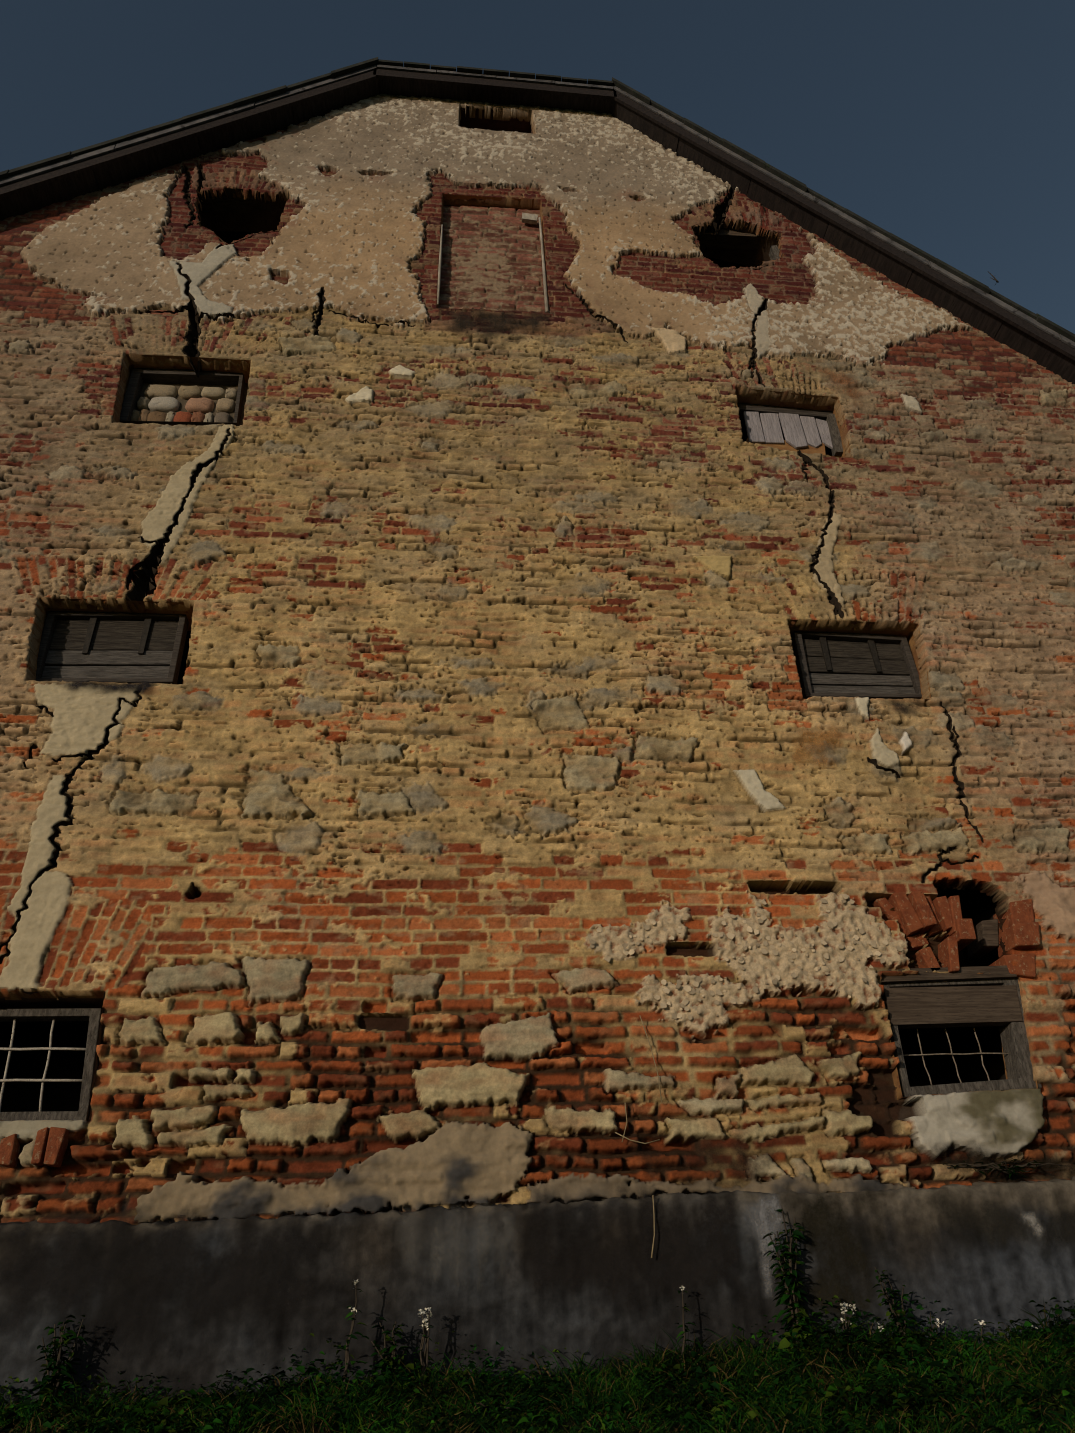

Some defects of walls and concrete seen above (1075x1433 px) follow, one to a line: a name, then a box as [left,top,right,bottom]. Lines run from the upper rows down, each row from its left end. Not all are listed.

crack [139,263,234,377]
flaking render [159,149,307,261]
flaking render [408,169,619,340]
flaking render [611,186,819,306]
crack [126,428,231,611]
crack [797,449,844,618]
crack [0,690,142,964]
crack [921,702,983,883]
flaking render [583,877,1013,1035]
leakage [0,1206,322,1341]
leakage [431,1191,781,1311]
leakage [798,1194,870,1318]